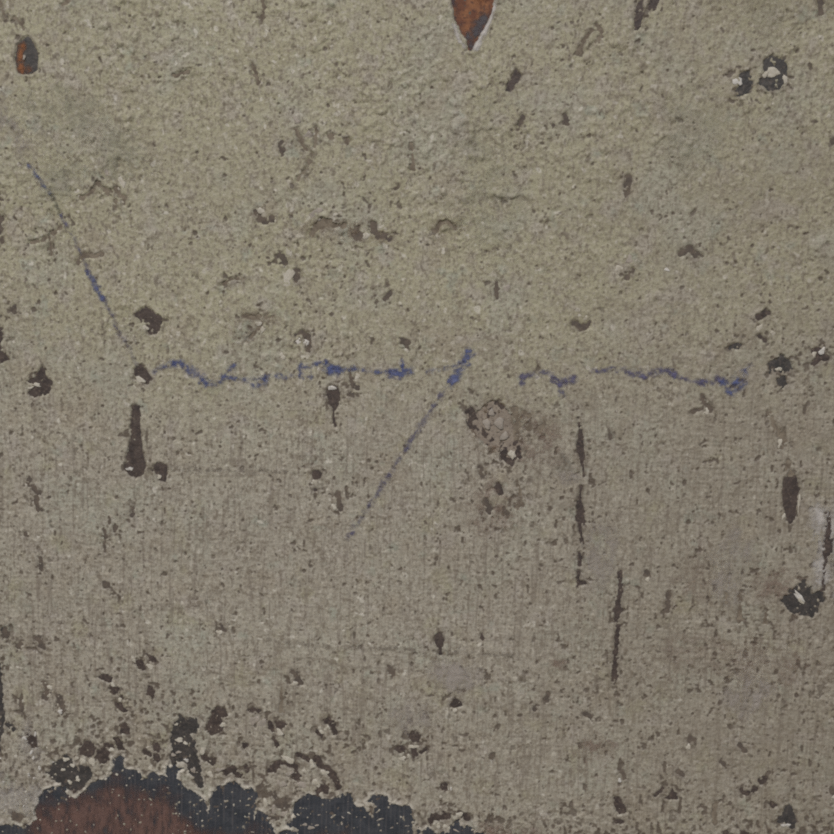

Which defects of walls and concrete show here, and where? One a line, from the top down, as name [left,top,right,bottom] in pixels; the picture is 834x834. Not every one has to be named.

peeling [780,579,825,618]
crack [611,570,624,684]
peeling [132,654,157,670]
peeling [0,663,484,834]
peeling [654,786,678,800]
peeling [739,776,768,796]
peeling [614,797,626,824]
peeling [768,801,797,829]